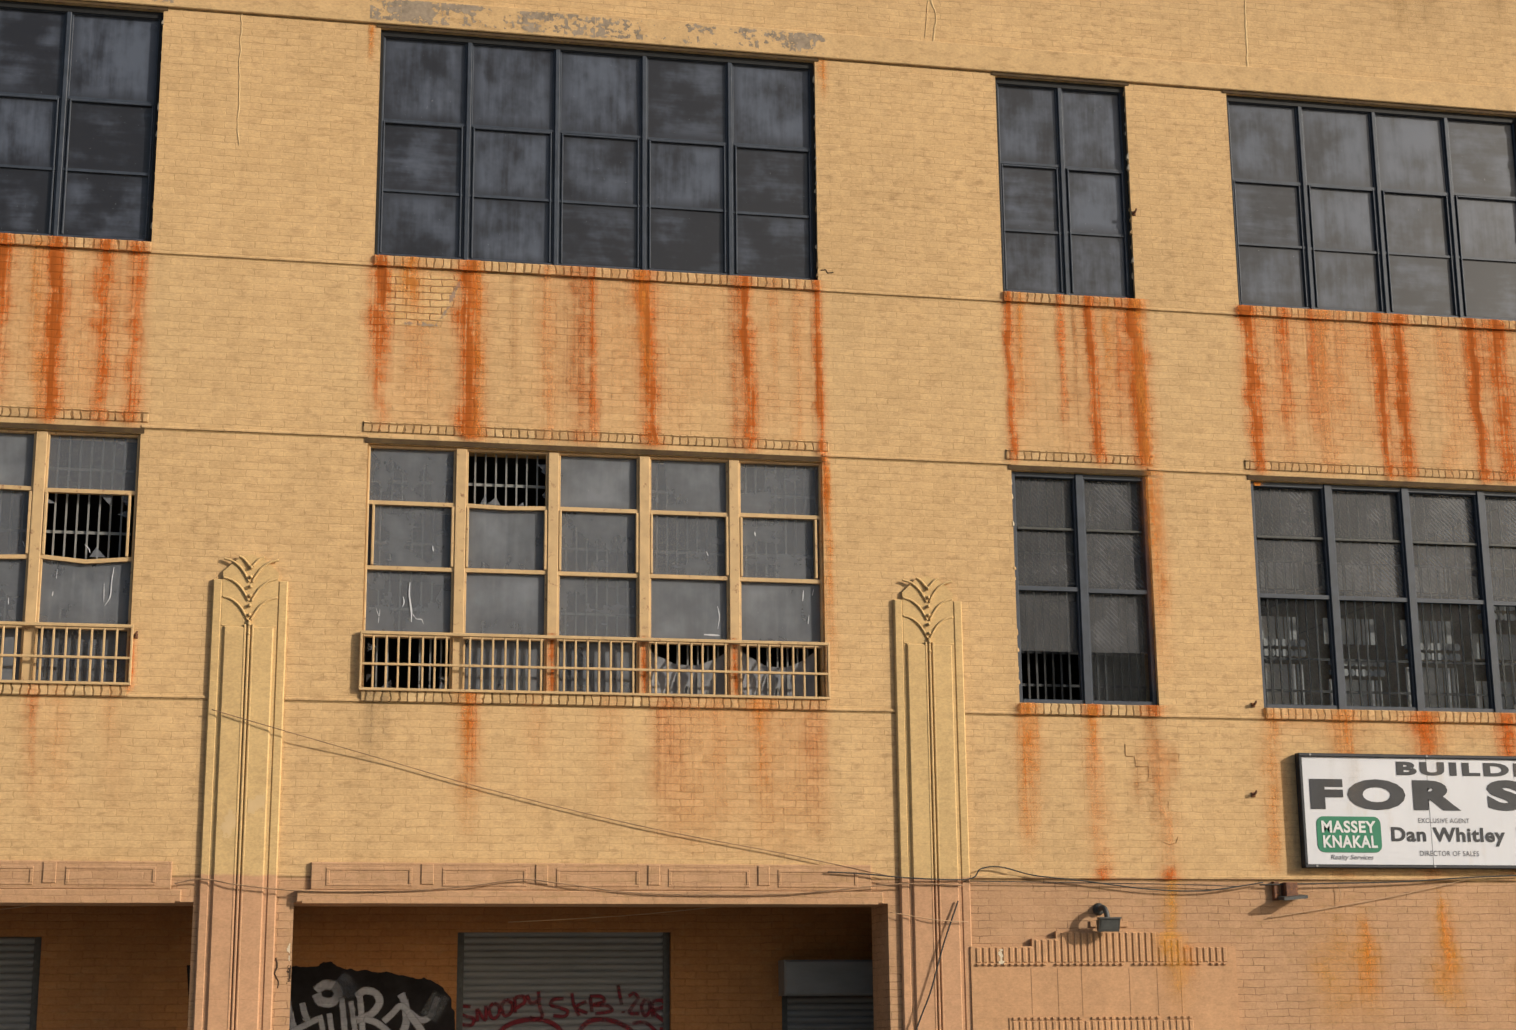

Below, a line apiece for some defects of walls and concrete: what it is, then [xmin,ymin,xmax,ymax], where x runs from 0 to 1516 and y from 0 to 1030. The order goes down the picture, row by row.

peeling [370,0,825,54]
rust [35,236,67,419]
rust [368,255,419,389]
rust [453,260,481,438]
rust [636,270,660,444]
rust [732,275,756,448]
rust [814,280,833,556]
rust [1003,291,1022,456]
rust [1084,295,1165,588]
rust [1237,305,1291,486]
rust [1357,312,1415,478]
rust [1463,318,1516,483]